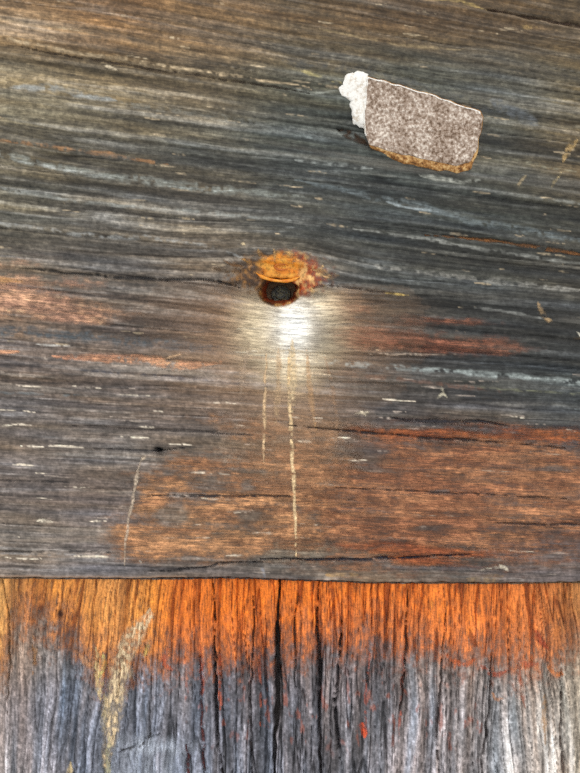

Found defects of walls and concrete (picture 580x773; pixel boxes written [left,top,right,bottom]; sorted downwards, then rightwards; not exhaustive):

rust [216,250,328,306]
crack [253,554,463,562]
crack [186,647,224,773]
crack [248,604,256,751]
crack [273,579,298,773]
crack [316,597,342,772]
crack [399,627,408,706]
crack [435,671,443,770]
crack [557,693,565,773]